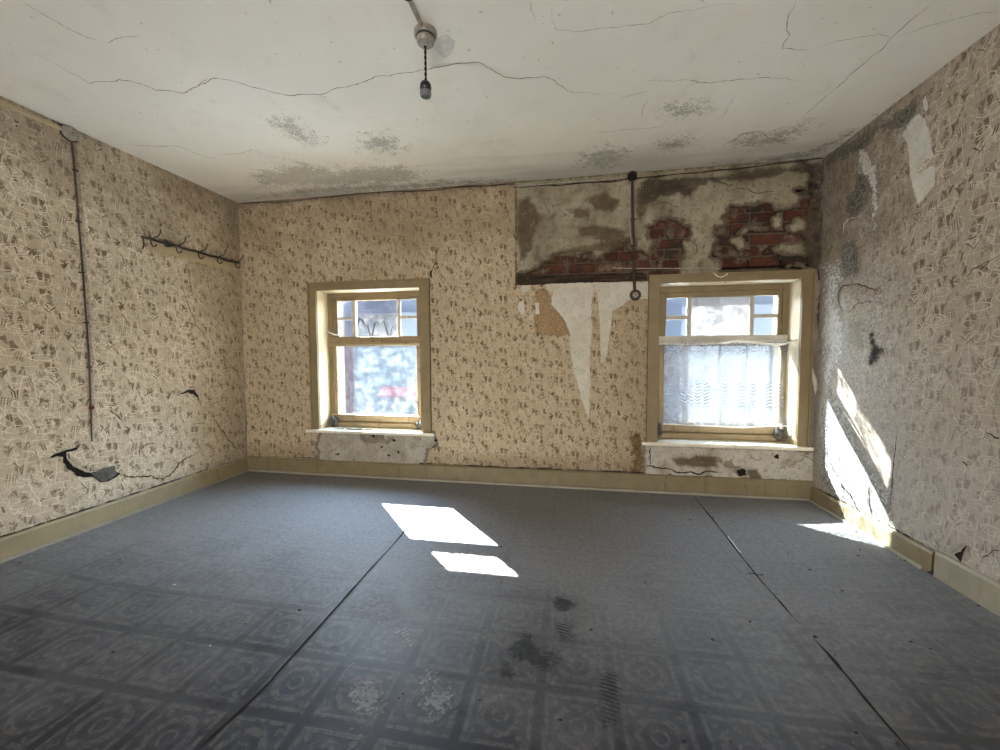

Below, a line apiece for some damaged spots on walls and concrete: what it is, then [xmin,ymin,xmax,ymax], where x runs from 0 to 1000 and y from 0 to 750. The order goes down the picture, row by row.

crack [530,2,735,32]
crack [31,54,595,96]
crack [723,2,998,146]
crack [590,77,790,134]
flaking render [515,158,824,293]
water stain [637,95,920,525]
crack [118,443,196,480]
flaking render [316,428,439,464]
crack [645,449,722,475]